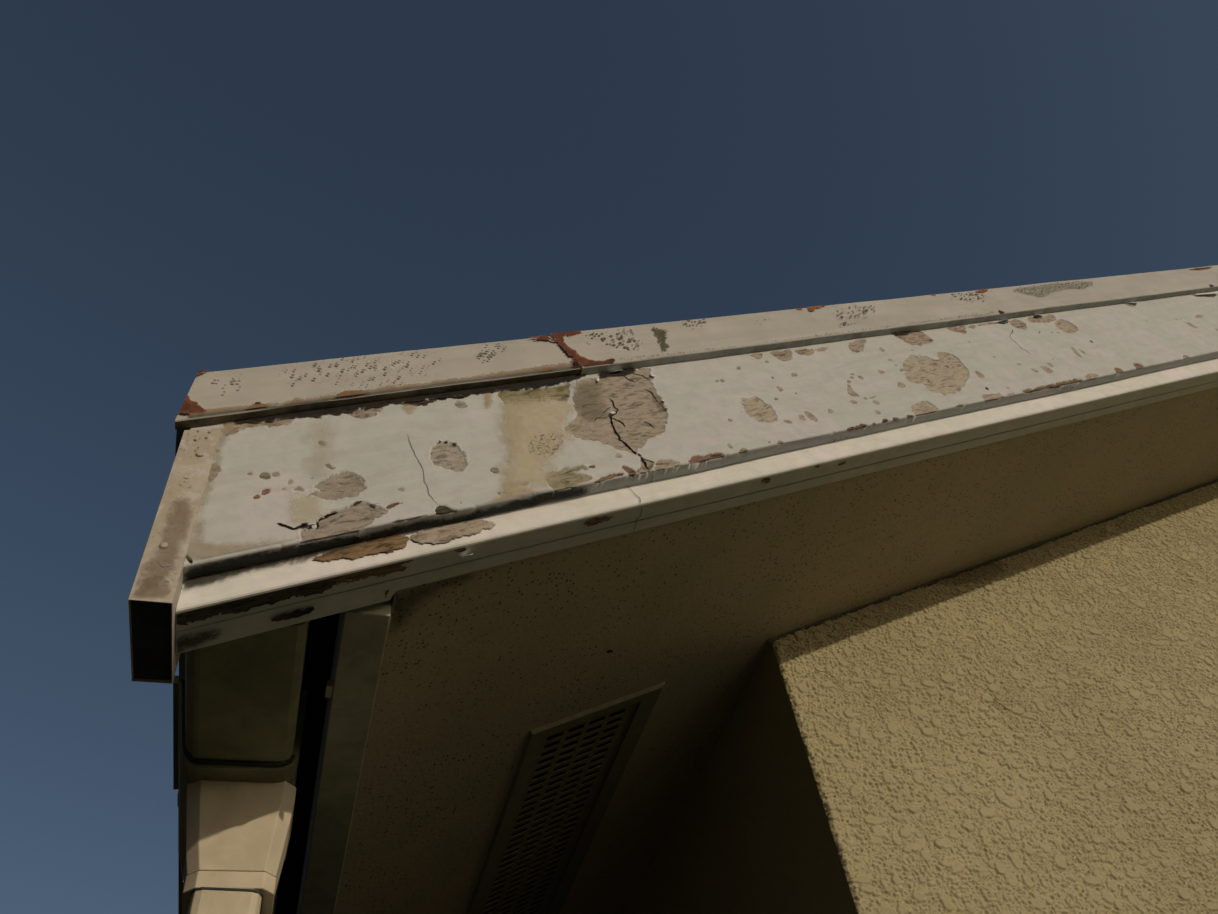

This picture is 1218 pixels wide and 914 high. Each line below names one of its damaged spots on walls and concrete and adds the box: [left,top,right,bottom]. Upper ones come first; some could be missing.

rust [180,395,207,413]
peeling [208,450,221,482]
peeling [221,369,747,490]
rust [529,331,615,366]
crack [583,373,665,530]
peeling [728,347,833,424]
peeling [847,331,1098,430]
peeling [947,314,1093,357]
peeling [176,464,495,625]
peeling [584,516,613,527]